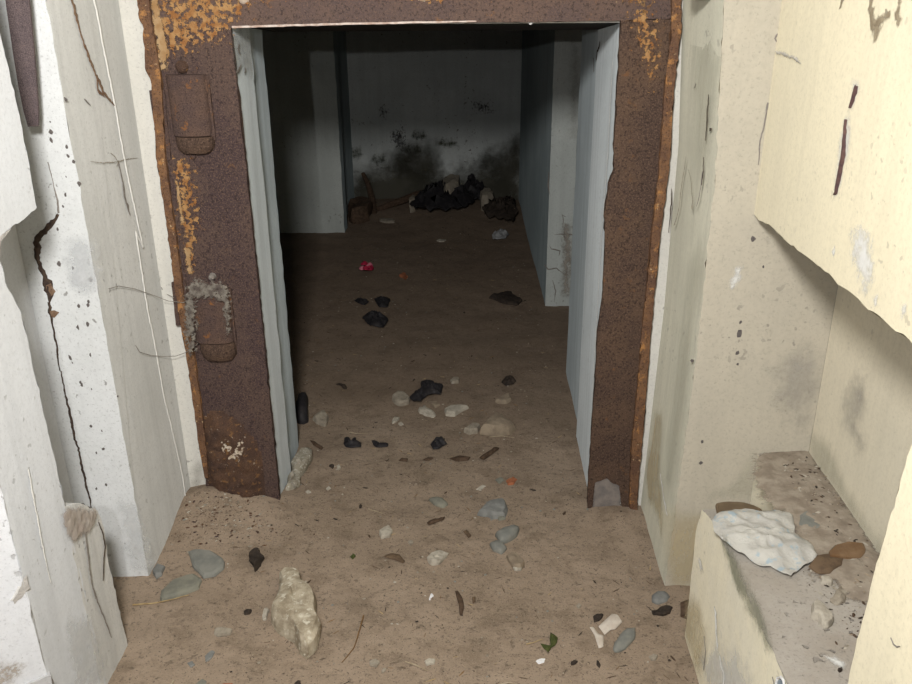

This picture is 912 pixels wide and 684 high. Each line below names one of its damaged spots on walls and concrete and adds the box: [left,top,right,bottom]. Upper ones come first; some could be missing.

corrosion [151,0,264,70]
corrosion [623,0,665,78]
leakage [354,126,445,199]
leakage [456,141,519,200]
corrosion [171,155,203,274]
crack [33,162,112,638]
corrosion [221,439,243,462]
spalling [64,507,97,541]
corrosion [593,478,621,507]